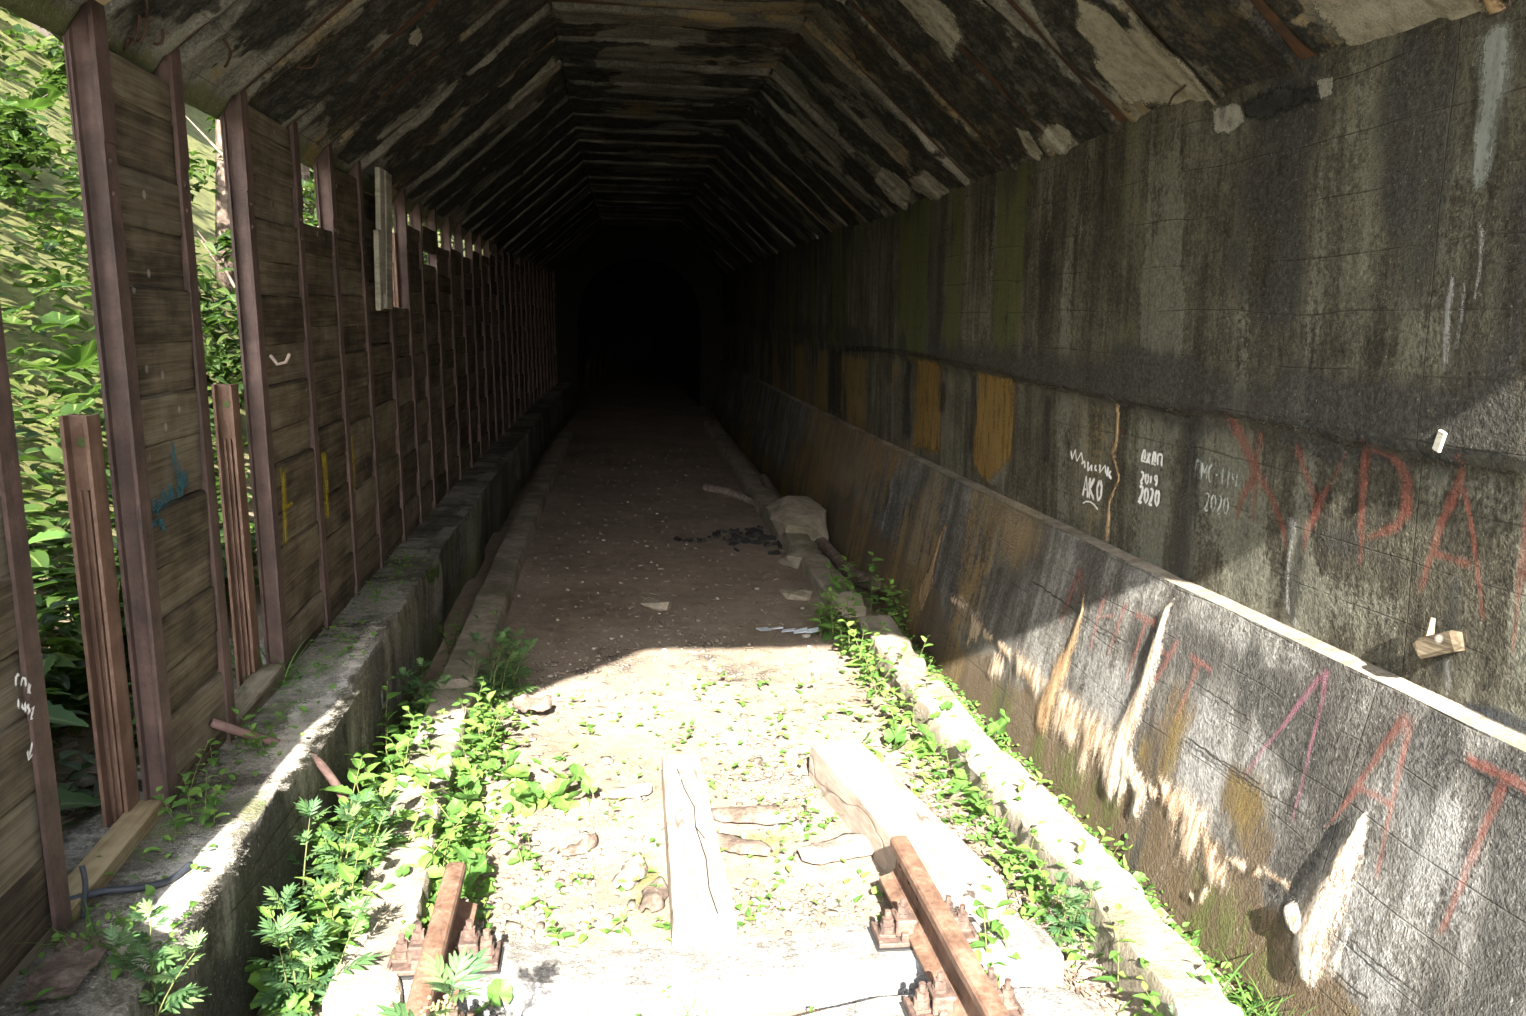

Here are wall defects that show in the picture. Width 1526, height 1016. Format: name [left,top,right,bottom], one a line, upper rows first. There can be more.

spalling [899,0,962,62]
spalling [1311,0,1485,47]
damp [1473,24,1508,188]
spalling [1015,124,1075,161]
spalling [873,167,950,210]
damp [1443,225,1484,366]